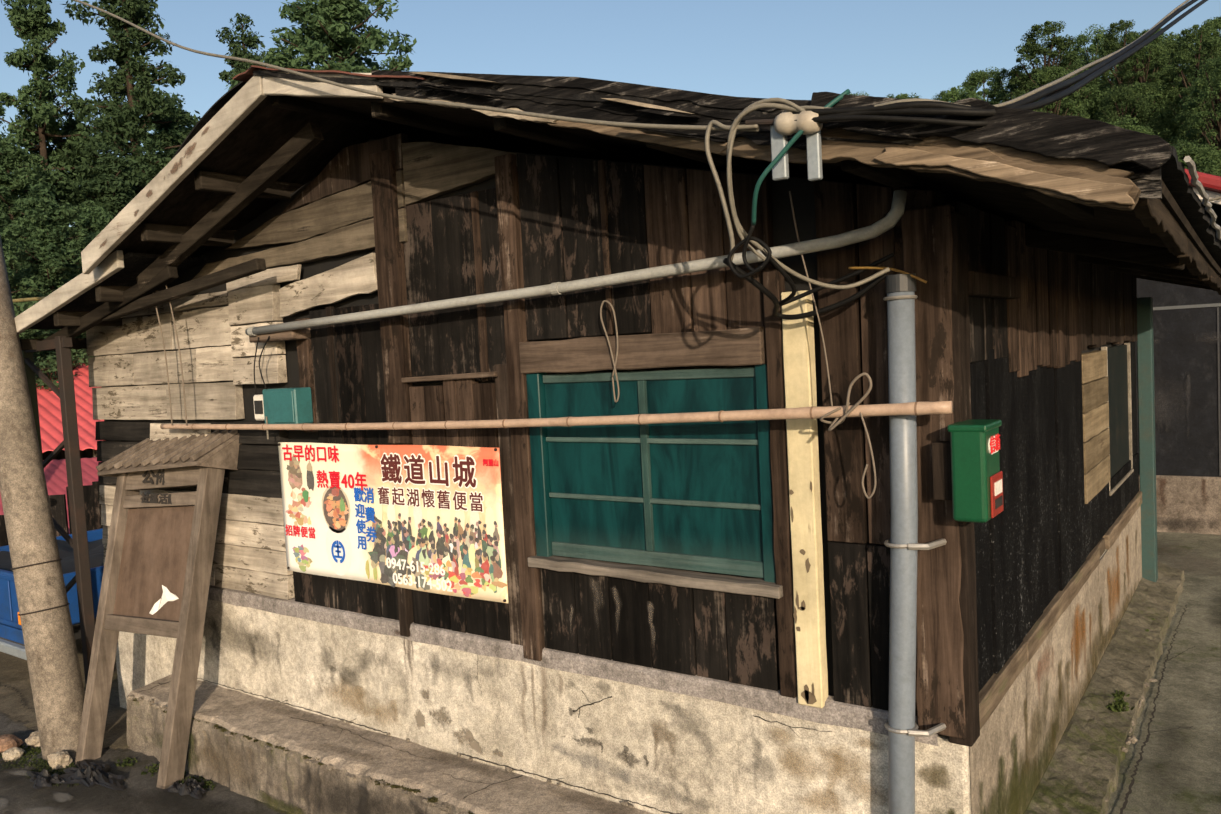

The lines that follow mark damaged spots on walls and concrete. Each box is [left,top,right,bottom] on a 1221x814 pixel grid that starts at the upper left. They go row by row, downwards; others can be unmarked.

peeling [793,593,806,631]
corrosion [1072,531,1137,675]
peeling [801,683,817,704]
crack [140,678,682,814]
leakage [564,728,603,753]
leakage [617,724,663,766]
leakage [923,768,946,785]
leakage [999,700,1028,814]